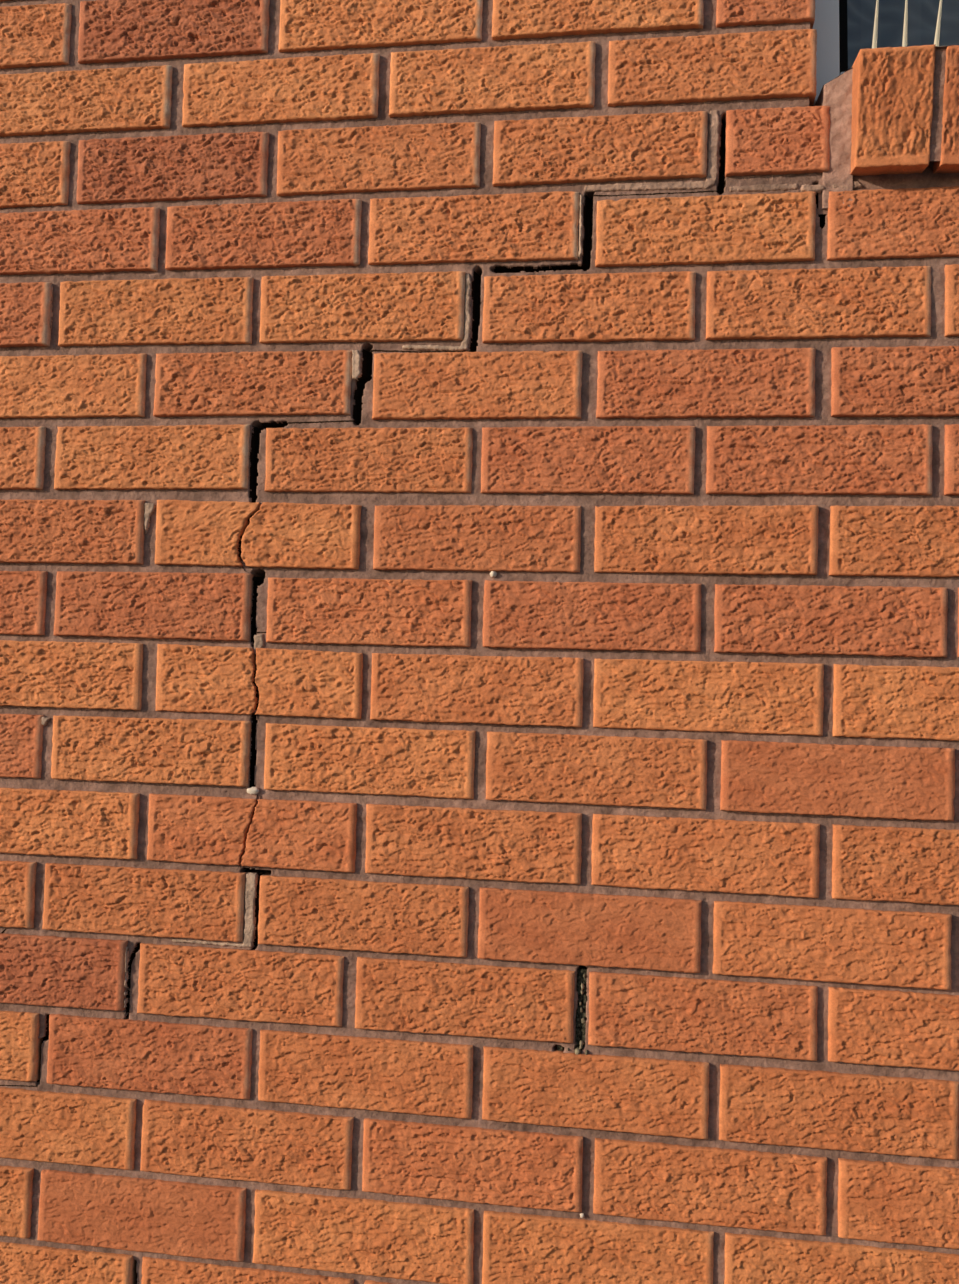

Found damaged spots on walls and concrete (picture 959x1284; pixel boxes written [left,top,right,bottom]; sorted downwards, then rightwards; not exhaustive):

crack [227,118,726,950]
crack [116,943,140,1019]
crack [0,1014,50,1087]